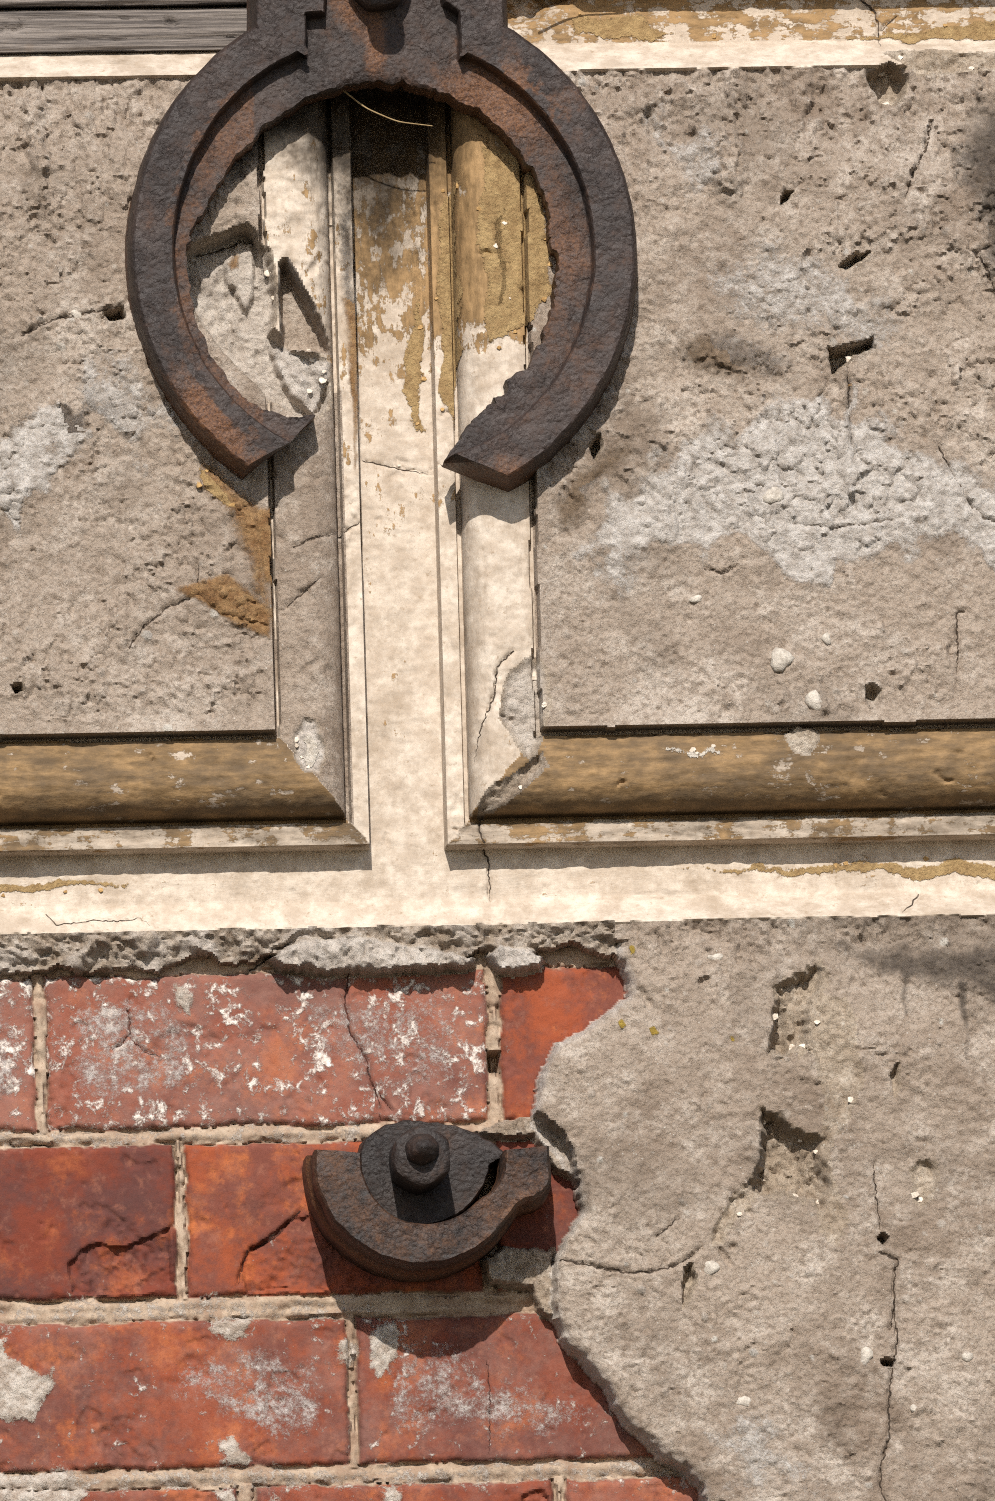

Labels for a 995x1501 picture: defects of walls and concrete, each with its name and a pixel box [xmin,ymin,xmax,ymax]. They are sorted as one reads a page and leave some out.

corrosion [345,298,358,448]
spalling [0,920,619,978]
crack [344,969,391,1116]
spalling [710,957,866,1248]
spalling [67,1227,175,1299]
crack [238,1211,300,1284]
spalling [242,1217,382,1295]
crack [551,1217,701,1273]
crack [873,1165,899,1501]
spalling [521,1489,551,1501]